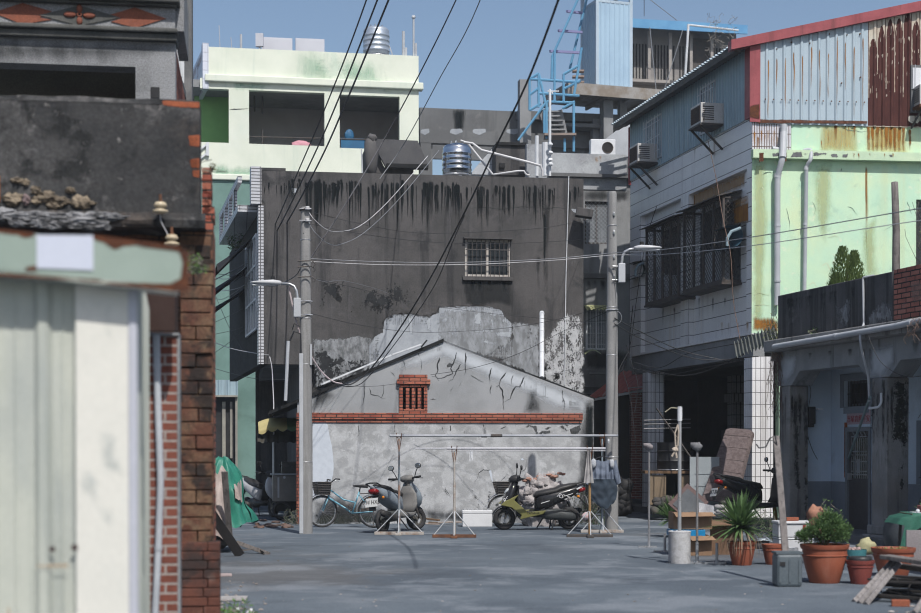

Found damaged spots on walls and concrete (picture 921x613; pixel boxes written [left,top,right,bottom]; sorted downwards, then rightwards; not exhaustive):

corrosion [750,13,921,149]
damp [264,174,555,264]
flaking render [313,305,585,392]
crack [403,352,524,403]
damp [780,396,808,520]
damp [870,380,909,446]